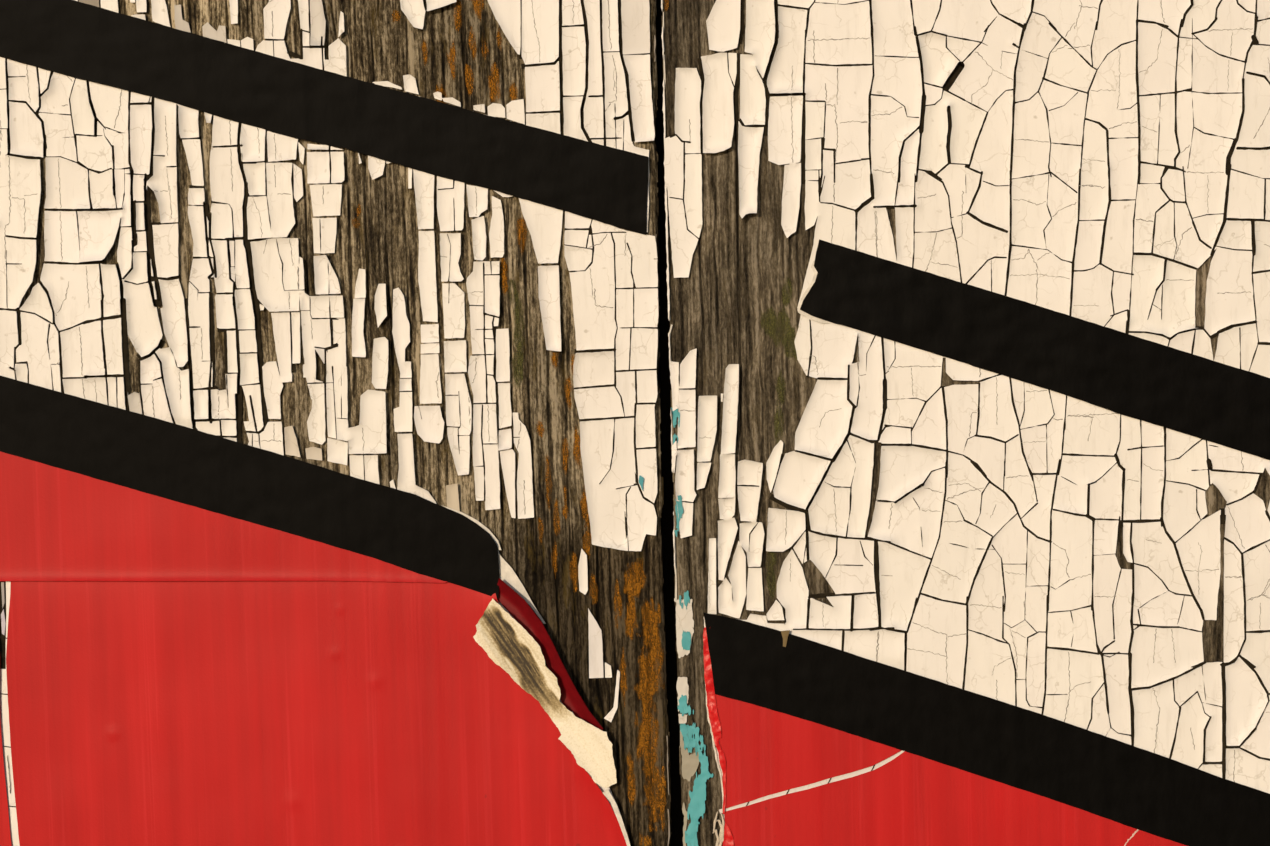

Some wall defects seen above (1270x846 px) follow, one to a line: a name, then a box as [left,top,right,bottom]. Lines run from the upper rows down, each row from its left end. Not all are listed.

peeling [118,0,269,51]
peeling [19,156,46,308]
peeling [104,219,138,265]
peeling [149,187,160,222]
peeling [176,105,214,299]
crack [0,0,658,551]
peeling [154,305,171,349]
peeling [127,336,139,394]
peeling [208,276,249,445]
peeling [246,0,835,846]
crack [578,549,588,595]